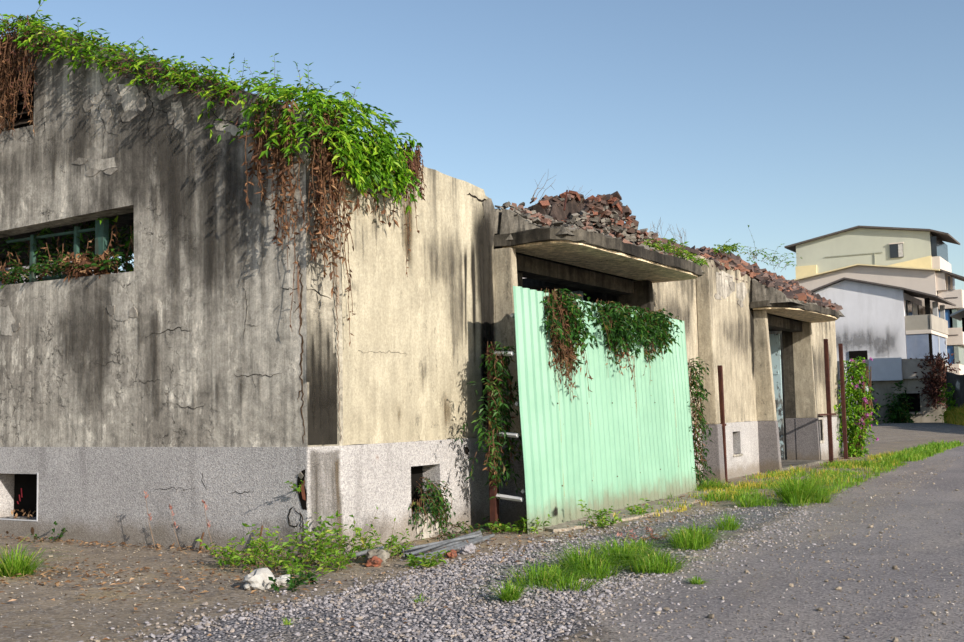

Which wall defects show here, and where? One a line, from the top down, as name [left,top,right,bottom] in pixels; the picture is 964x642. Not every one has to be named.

water stain [306,329,340,543]
water stain [459,214,494,424]
water stain [814,333,895,380]